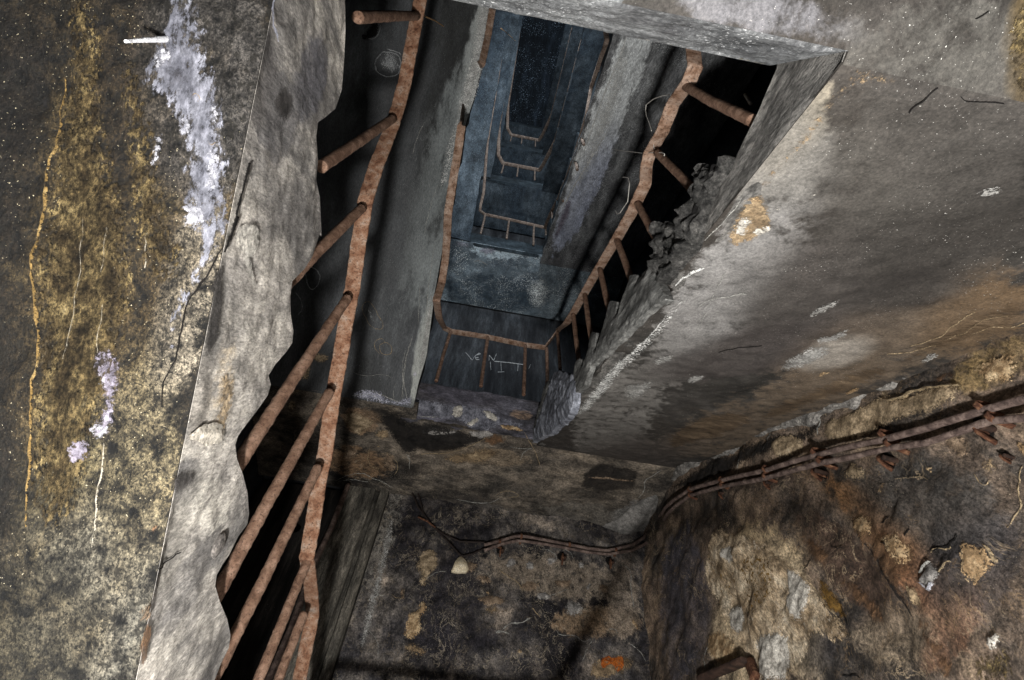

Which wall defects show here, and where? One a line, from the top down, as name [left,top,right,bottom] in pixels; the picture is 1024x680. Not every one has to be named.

leakage [274,89,292,123]
spalling [729,196,778,246]
leakage [24,0,229,547]
crack [161,163,251,407]
spalling [343,155,735,475]
rust [216,375,234,429]
flaking render [959,543,998,587]